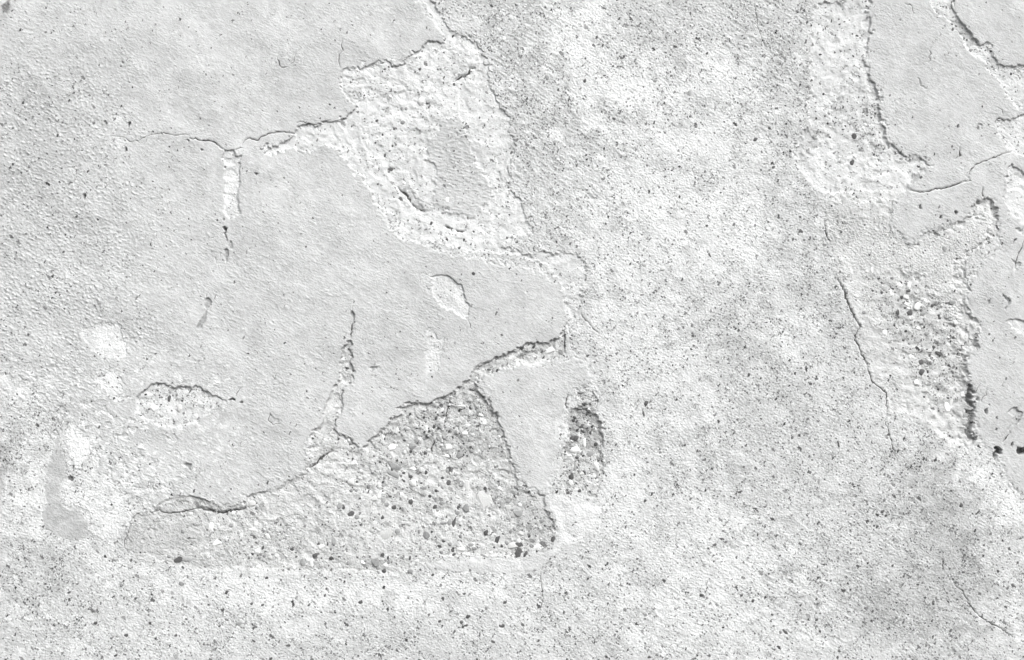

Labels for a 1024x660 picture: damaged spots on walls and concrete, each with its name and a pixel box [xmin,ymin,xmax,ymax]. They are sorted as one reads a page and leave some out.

spalling [57,0,588,576]
spalling [559,389,605,501]
crack [839,282,896,457]
spalling [792,0,1024,449]
crack [911,147,1009,199]